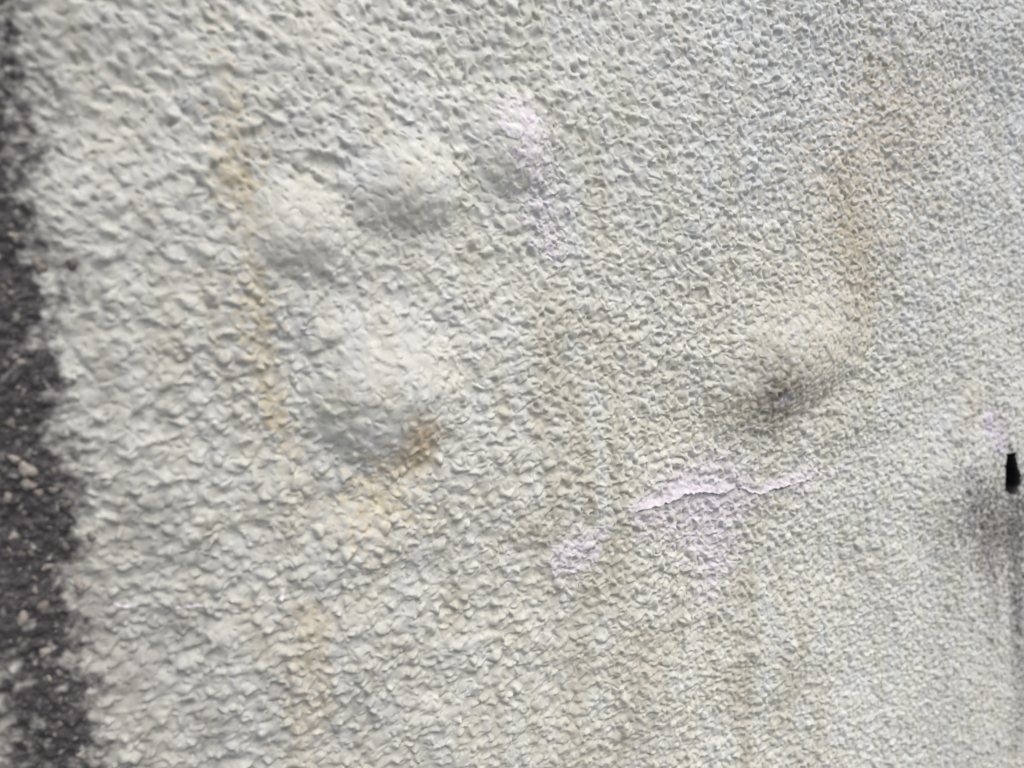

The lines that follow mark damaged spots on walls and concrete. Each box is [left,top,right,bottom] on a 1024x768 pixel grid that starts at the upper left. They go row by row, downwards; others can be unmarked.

crack [613,420,854,652]